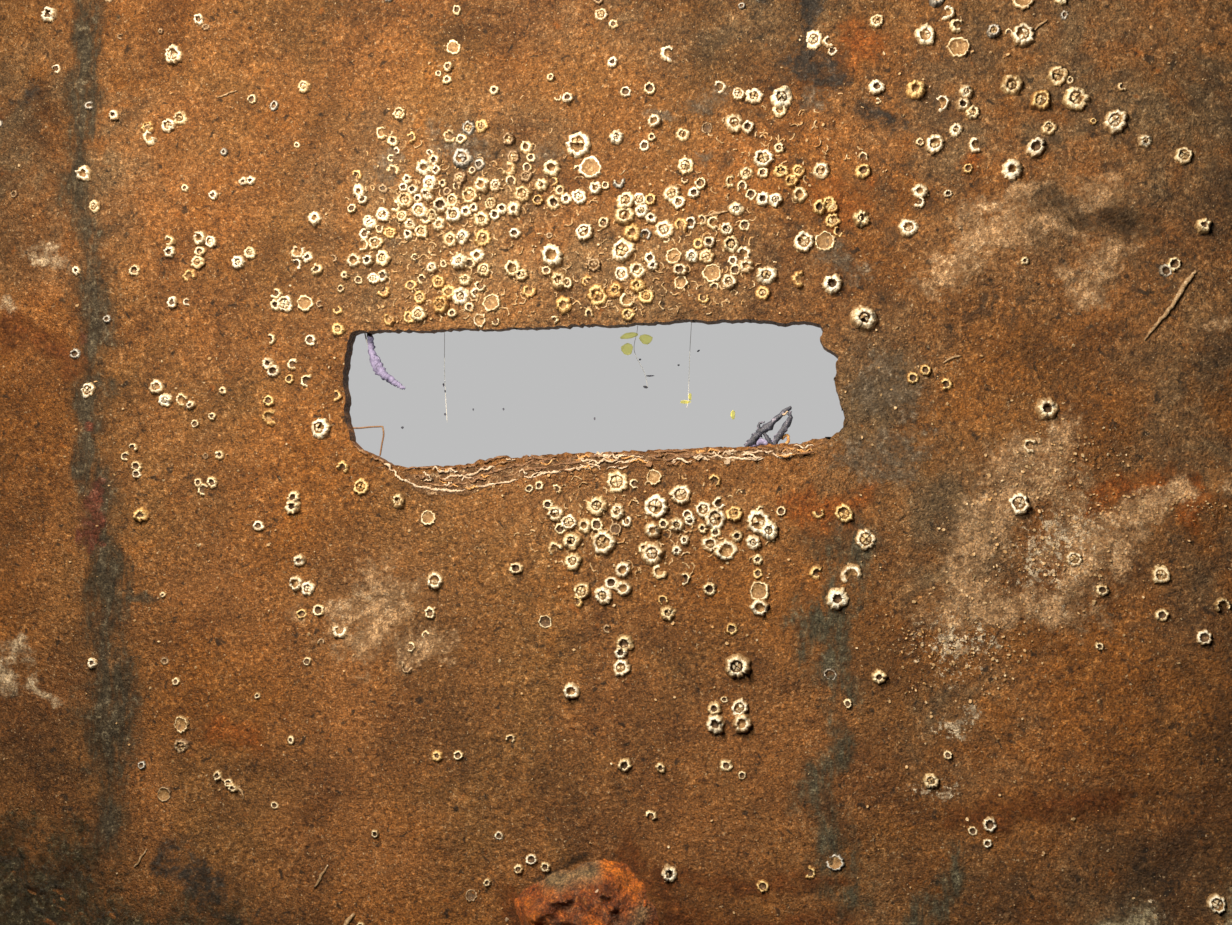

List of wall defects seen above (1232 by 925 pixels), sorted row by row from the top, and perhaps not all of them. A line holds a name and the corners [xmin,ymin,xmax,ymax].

water stain [59,0,153,859]
rust [501,886,521,925]
rust [616,833,854,925]